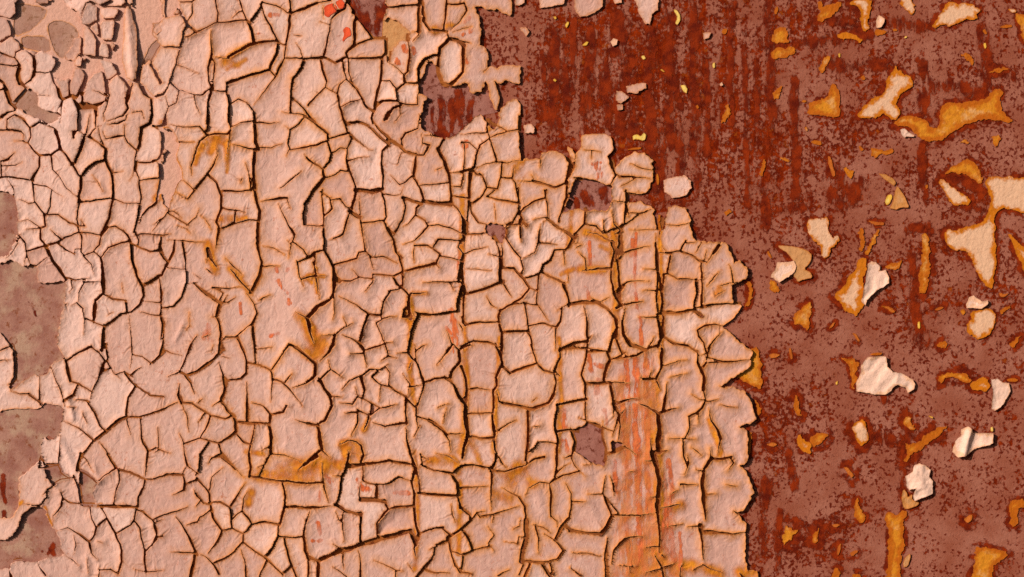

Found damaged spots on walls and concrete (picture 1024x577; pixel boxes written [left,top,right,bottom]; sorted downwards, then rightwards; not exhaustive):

peeling [0,191,67,389]
peeling [0,403,99,569]
crack [0,0,758,577]
peeling [539,0,659,25]
rust [539,2,712,207]
rust [613,298,723,577]
rust [725,0,931,286]
peeling [839,352,915,395]
rust [846,406,946,534]
peeling [802,62,1024,342]
peeling [883,412,993,577]
rust [915,23,1016,116]